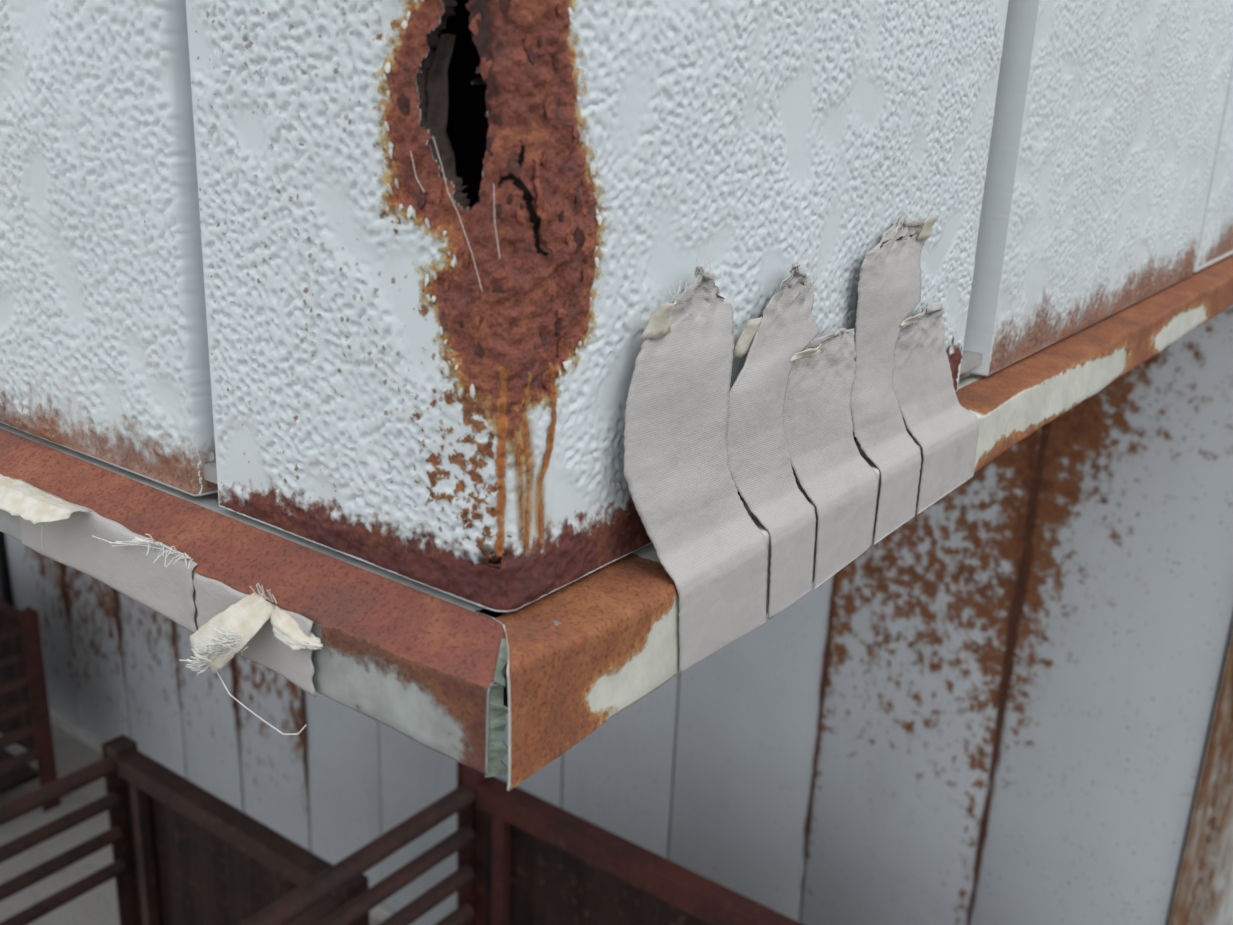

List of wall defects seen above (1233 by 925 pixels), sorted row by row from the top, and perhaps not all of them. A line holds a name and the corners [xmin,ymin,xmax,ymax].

peeling [0,474,92,525]
peeling [190,593,323,673]
rust [0,0,678,791]
rust [804,224,1233,925]